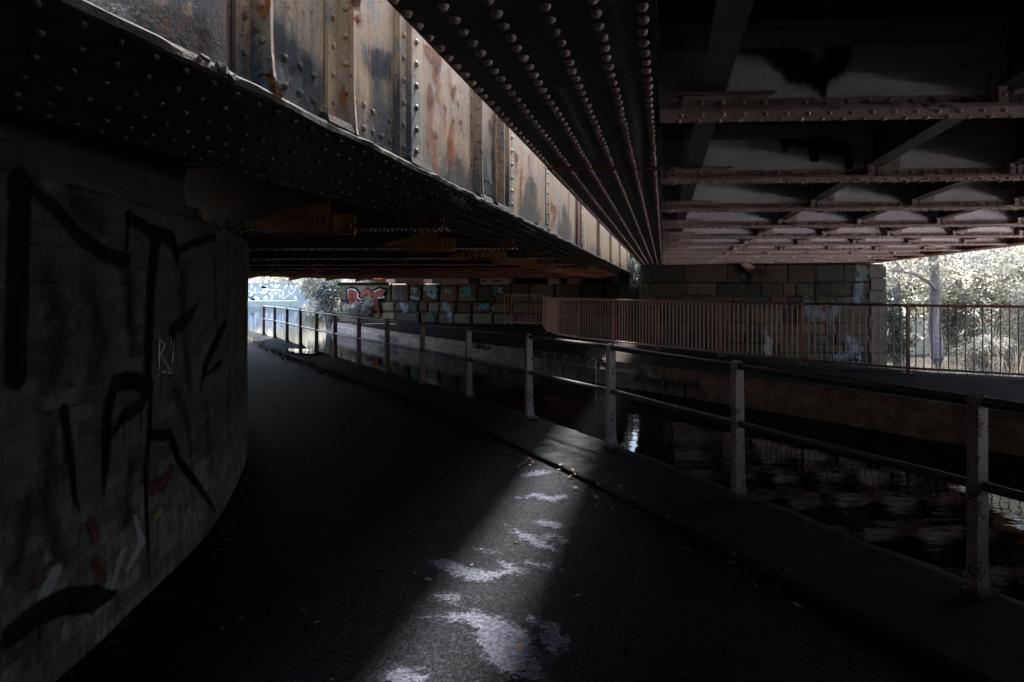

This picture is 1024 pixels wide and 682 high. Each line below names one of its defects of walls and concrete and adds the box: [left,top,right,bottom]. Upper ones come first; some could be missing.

corrosion [256,0,271,18]
corrosion [266,73,283,99]
corrosion [425,44,462,169]